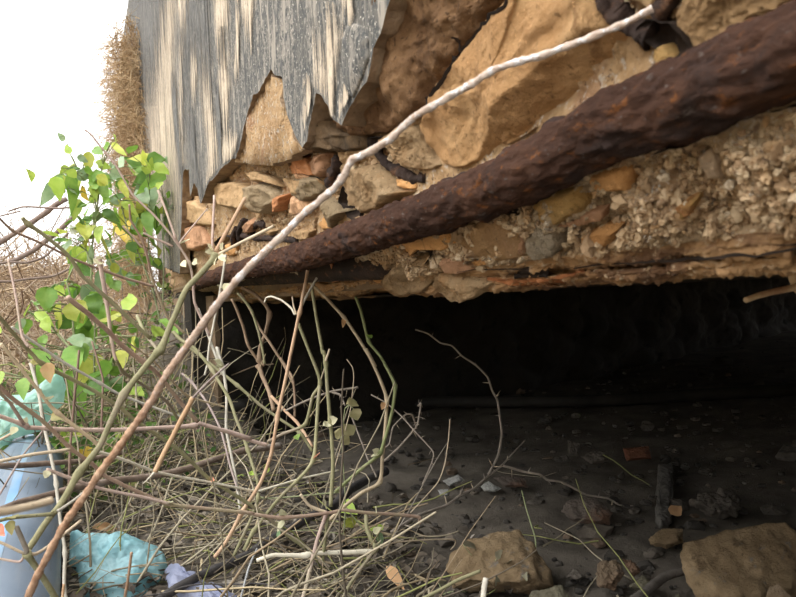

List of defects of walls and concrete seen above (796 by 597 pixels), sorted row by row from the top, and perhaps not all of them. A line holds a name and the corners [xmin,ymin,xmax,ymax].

spalling [143,0,796,303]
rust [487,269,586,286]